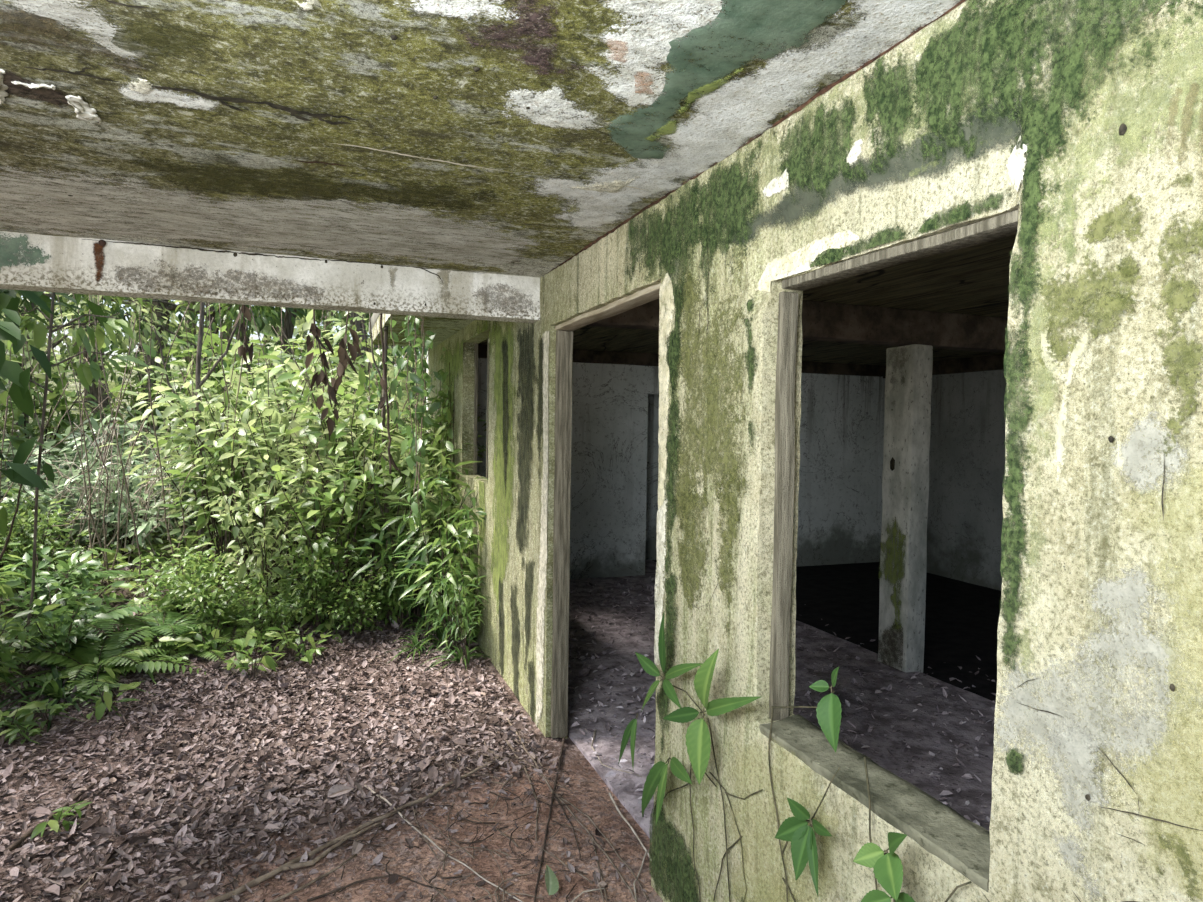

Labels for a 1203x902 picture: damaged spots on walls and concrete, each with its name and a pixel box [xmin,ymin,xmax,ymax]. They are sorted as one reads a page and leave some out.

spalling [0,68,101,124]
peeling [0,0,220,111]
peeling [501,87,603,130]
peeling [530,0,960,231]
corrosion [93,243,105,282]
water stain [498,323,544,721]